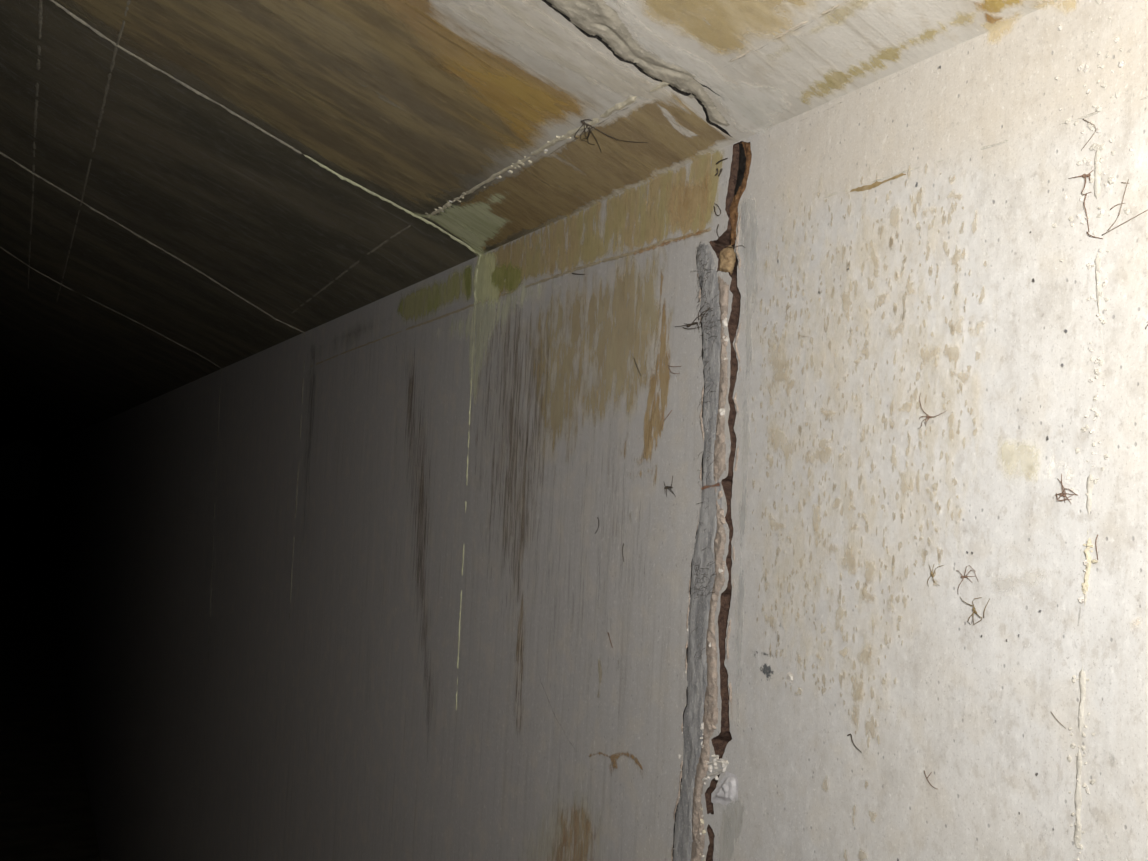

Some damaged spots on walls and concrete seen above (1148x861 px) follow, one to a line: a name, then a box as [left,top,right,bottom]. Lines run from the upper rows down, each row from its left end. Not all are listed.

damp [61,0,571,400]
damp [534,256,659,449]
crack [542,0,752,861]
spalling [671,243,729,861]
damp [647,0,804,51]